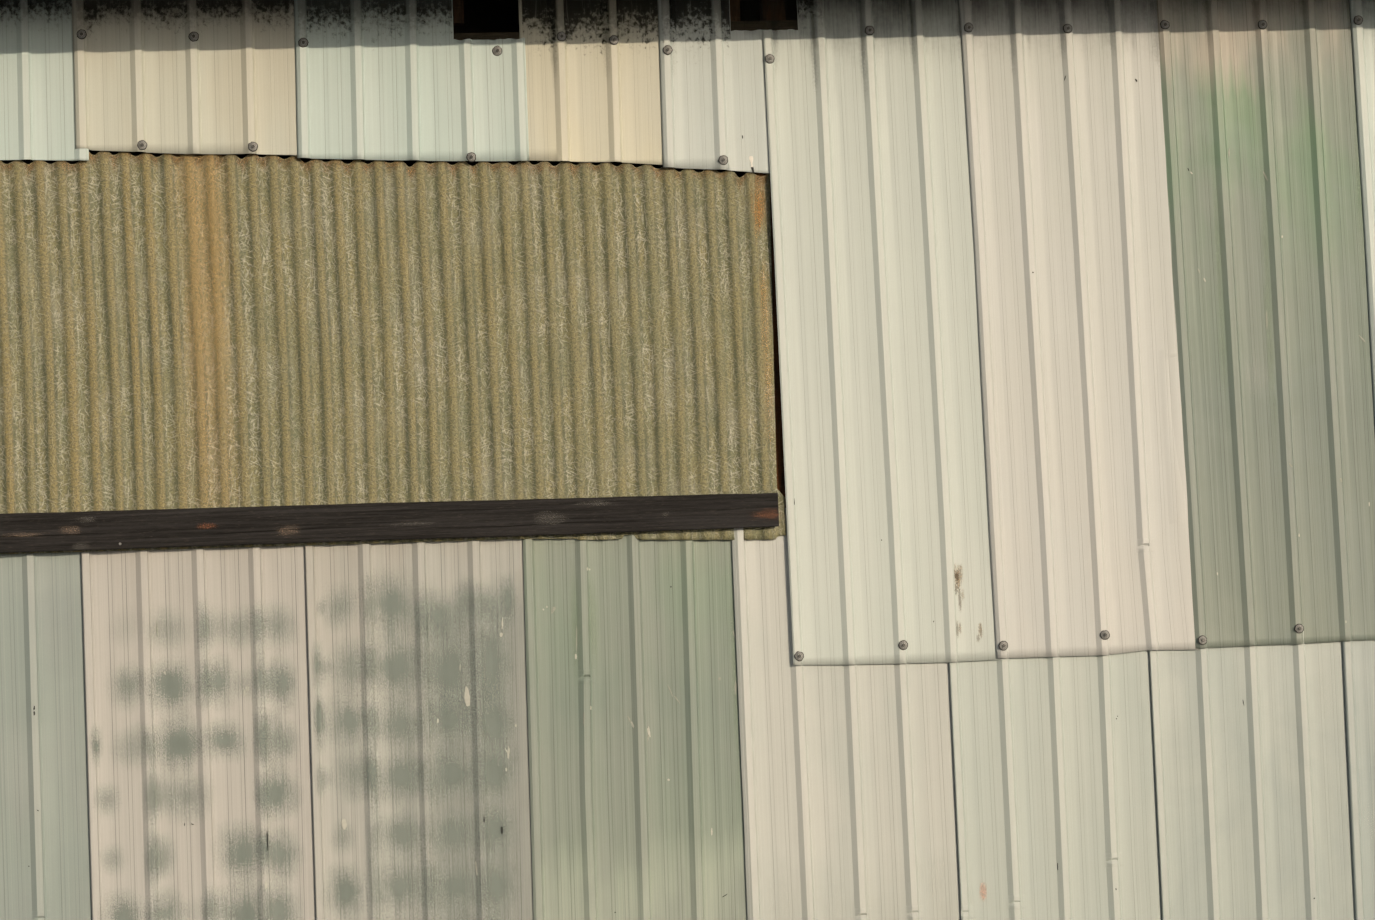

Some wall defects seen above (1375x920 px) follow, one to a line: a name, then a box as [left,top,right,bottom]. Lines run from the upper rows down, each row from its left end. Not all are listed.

water stain [0,0,452,36]
water stain [522,0,730,53]
water stain [155,670,192,705]
water stain [315,701,364,736]
water stain [366,587,512,851]
water stain [163,725,241,762]